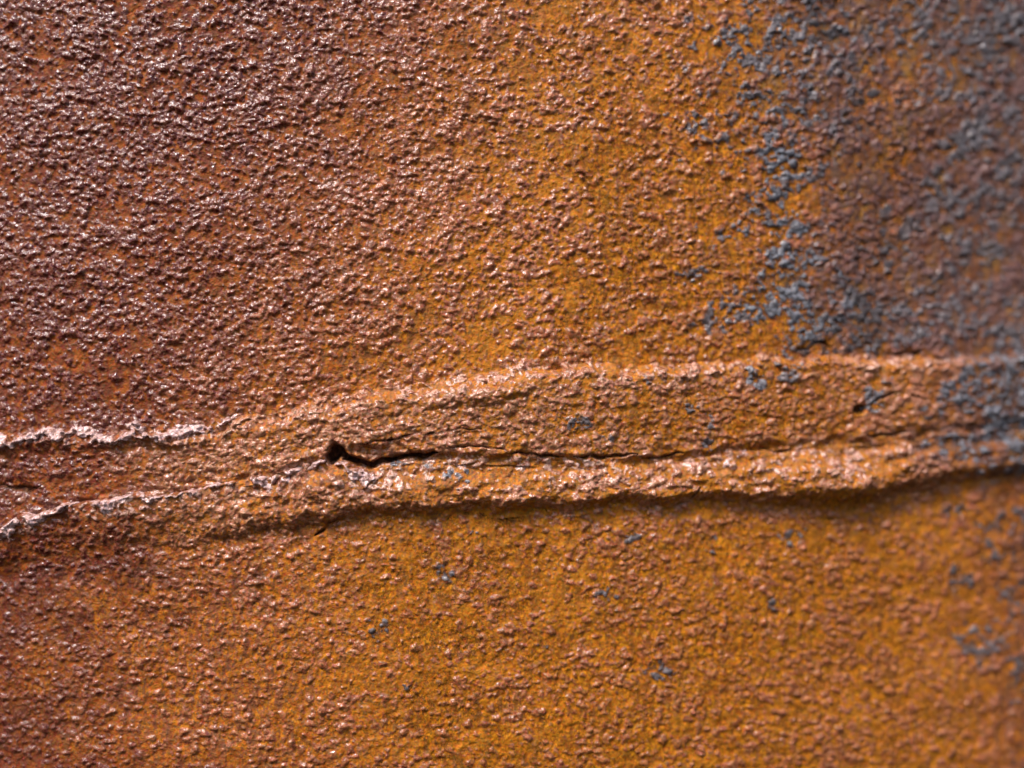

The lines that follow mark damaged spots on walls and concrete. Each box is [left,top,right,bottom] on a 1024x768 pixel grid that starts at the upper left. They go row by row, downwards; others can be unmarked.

corrosion [845,27,968,133]
corrosion [528,0,893,468]
corrosion [0,481,237,540]
corrosion [0,408,242,449]
corrosion [250,459,376,491]
crack [343,427,682,467]
corrosion [0,555,171,659]
corrosion [335,443,988,768]
corrosion [0,681,74,766]